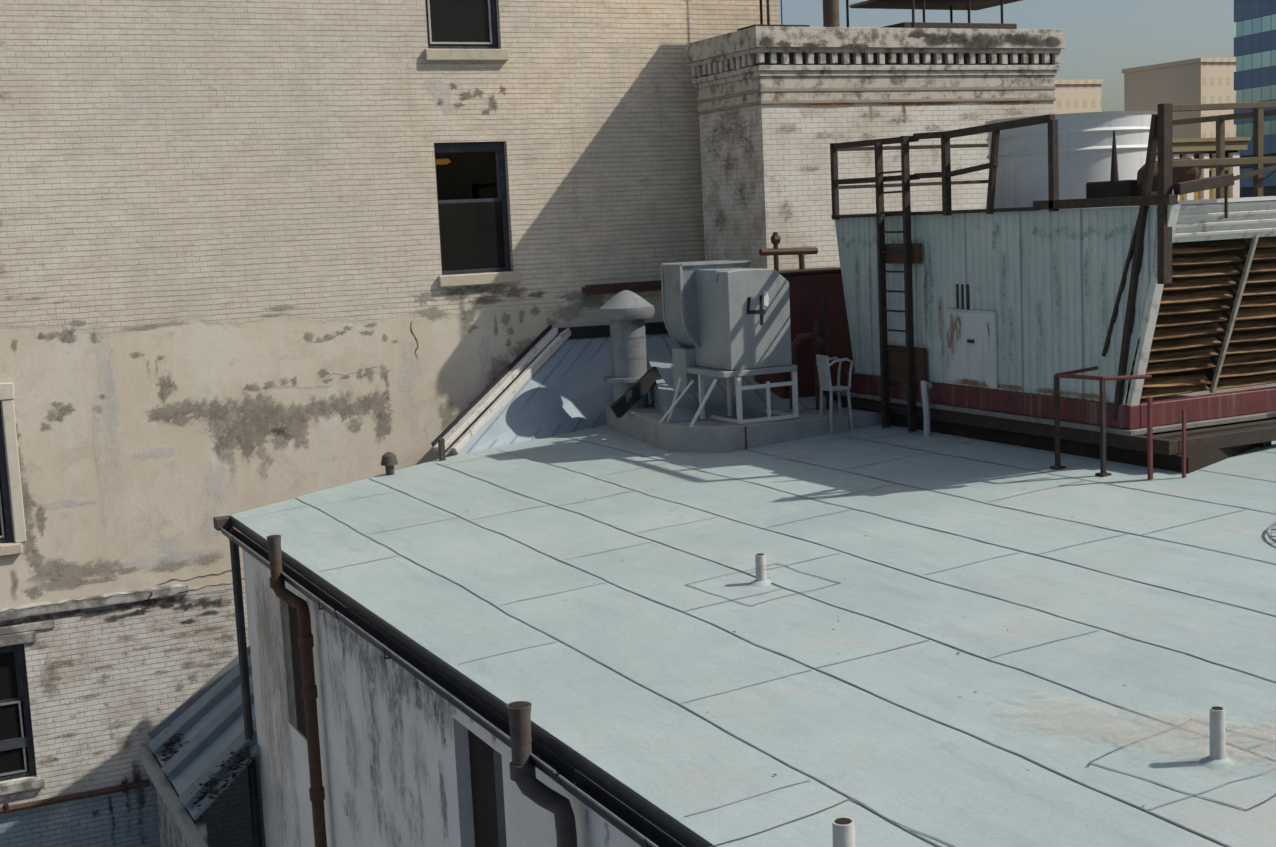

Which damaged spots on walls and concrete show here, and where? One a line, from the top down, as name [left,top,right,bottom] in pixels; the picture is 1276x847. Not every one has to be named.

peeling [438,83,506,114]
peeling [133,353,391,461]
peeling [15,423,46,567]
spalling [0,598,235,692]